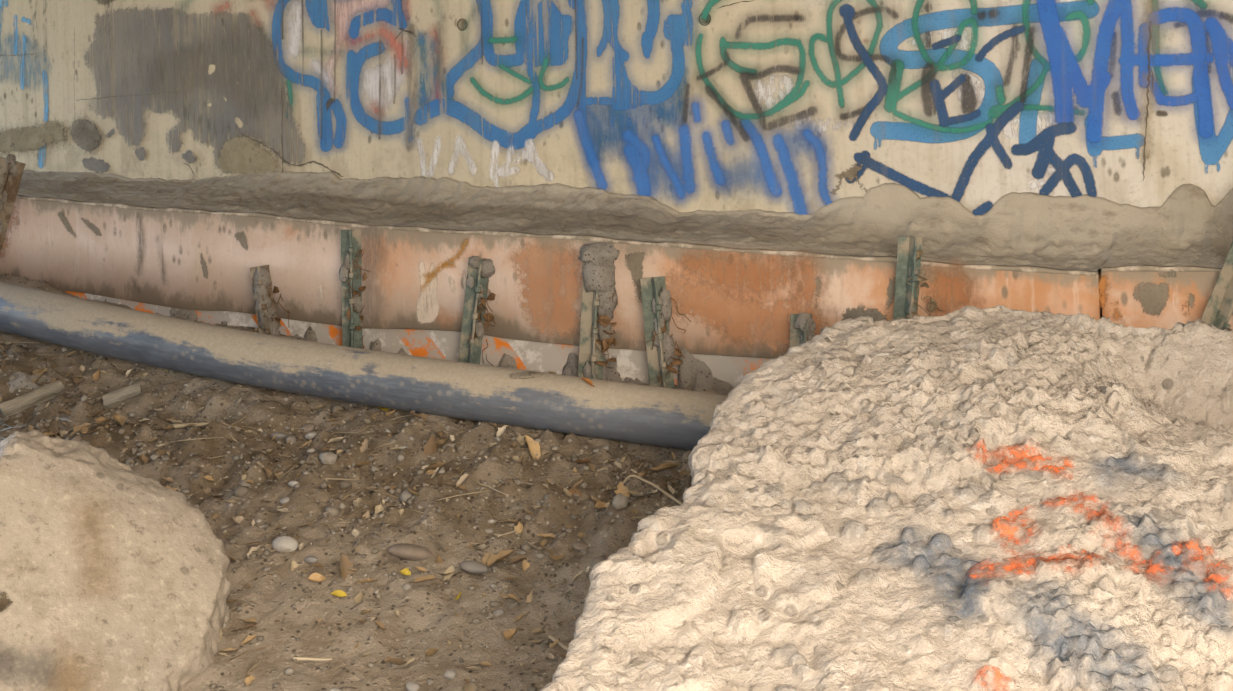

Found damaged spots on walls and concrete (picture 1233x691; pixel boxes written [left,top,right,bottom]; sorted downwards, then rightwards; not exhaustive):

rust [423,239,468,288]
rust [1099,276,1122,320]